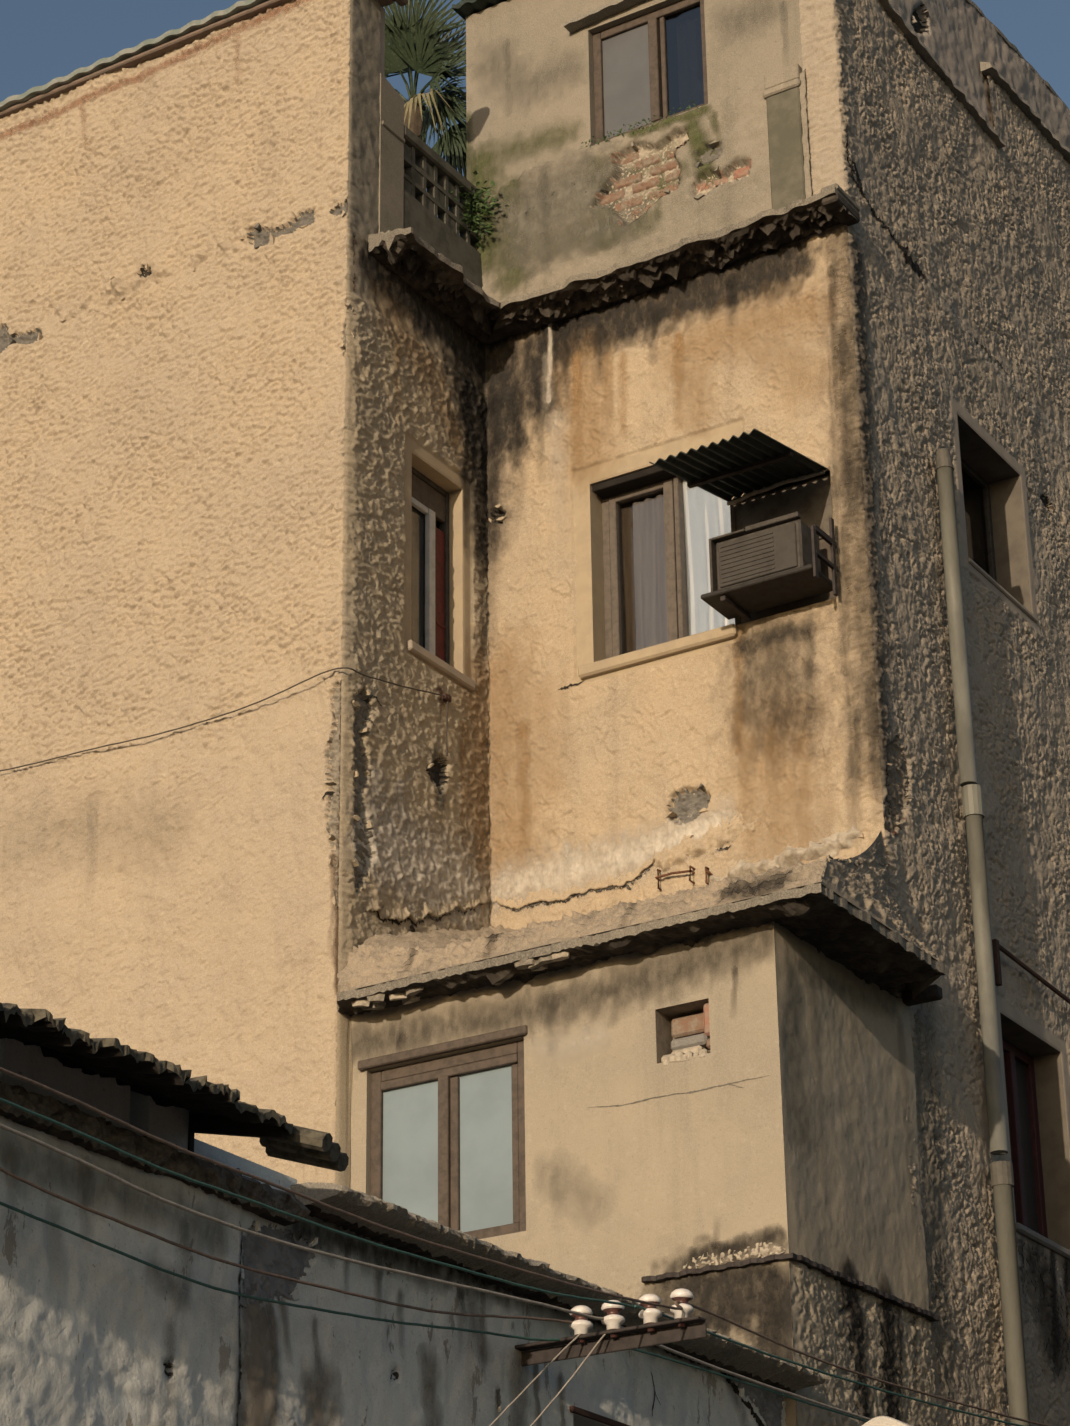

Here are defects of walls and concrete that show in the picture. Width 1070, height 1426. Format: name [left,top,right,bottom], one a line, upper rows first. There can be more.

spalling [247,199,359,249]
damp [485,156,639,266]
flaking render [590,129,751,227]
crack [846,125,1008,374]
spalling [0,323,43,354]
damp [359,241,811,566]
damp [737,622,813,676]
crack [338,810,744,932]
peeling [654,783,757,891]
crack [589,1075,770,1108]
spalling [241,1220,322,1306]
damp [841,1259,914,1420]